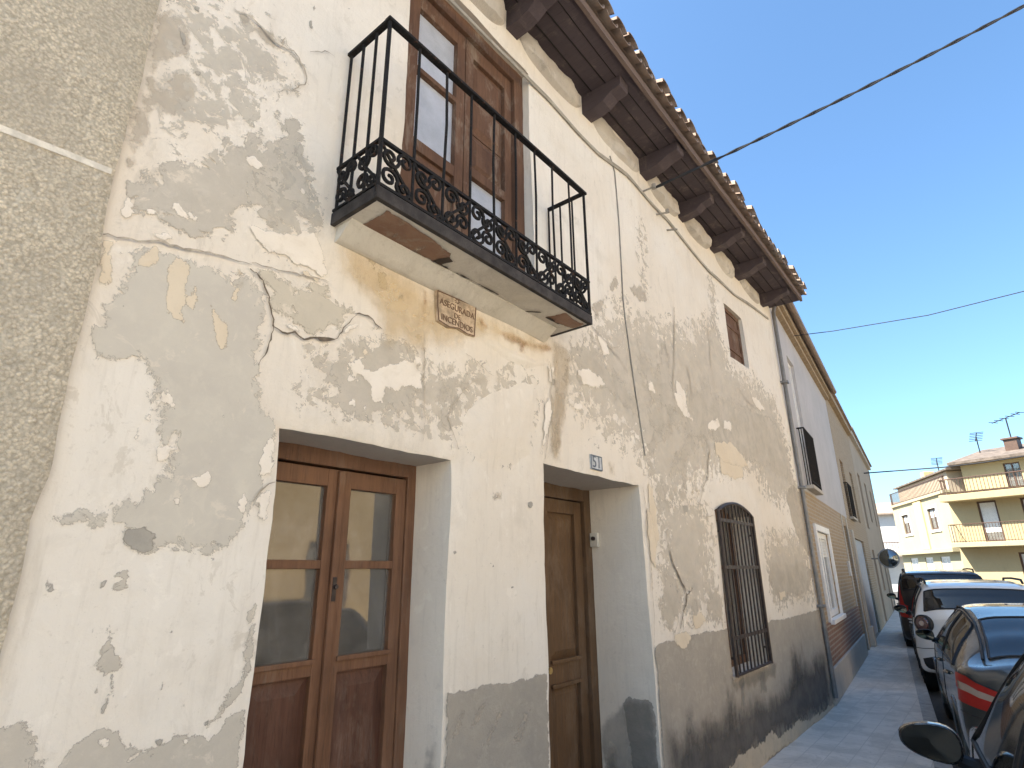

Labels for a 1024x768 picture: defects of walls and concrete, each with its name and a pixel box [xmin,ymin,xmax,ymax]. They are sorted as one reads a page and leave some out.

peeling [53,110,423,560]
crack [103,233,382,363]
spalling [545,313,584,328]
peeling [568,333,793,484]
peeling [100,570,128,591]
crack [643,490,693,643]
peeling [660,569,691,649]
spalling [0,722,45,768]
spalling [58,603,257,768]
water stain [673,657,830,768]